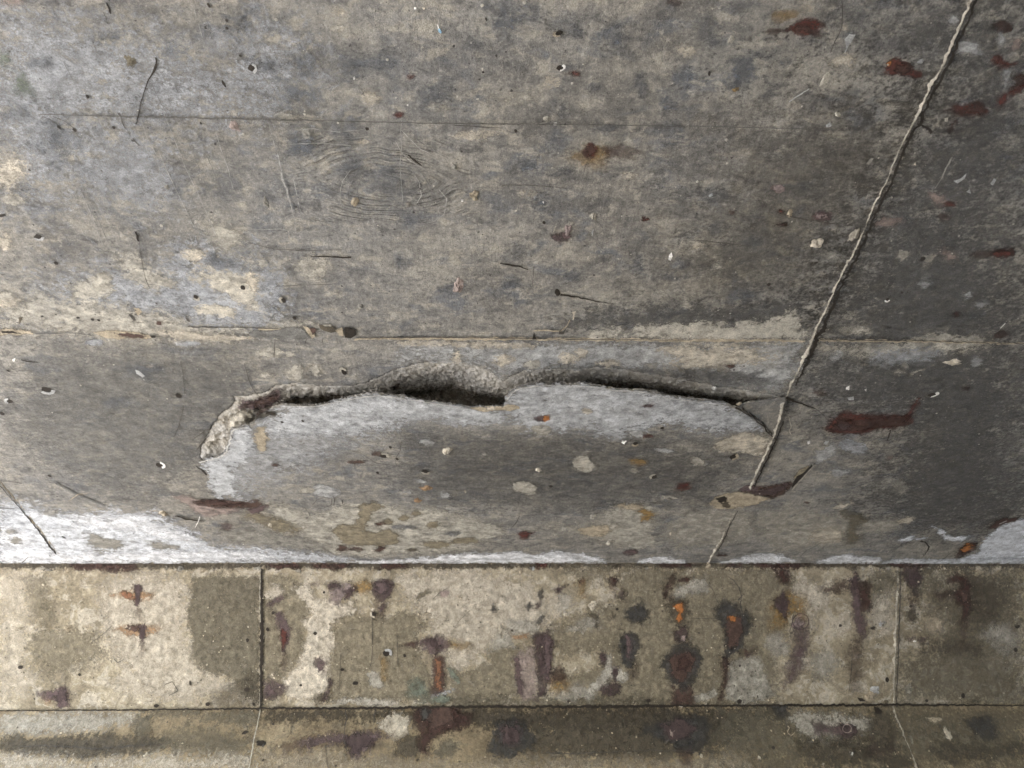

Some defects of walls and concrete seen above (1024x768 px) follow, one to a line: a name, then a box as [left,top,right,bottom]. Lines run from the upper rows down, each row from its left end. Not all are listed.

rust [766,18,823,36]
crack [583,0,977,489]
spalling [199,361,787,463]
spalling [710,491,770,509]
rust [112,584,154,606]
rust [117,624,161,646]
damp [187,573,310,704]
rust [401,635,473,755]
rust [512,631,570,702]
rust [657,563,704,705]
rust [713,600,754,701]
rust [820,572,873,648]